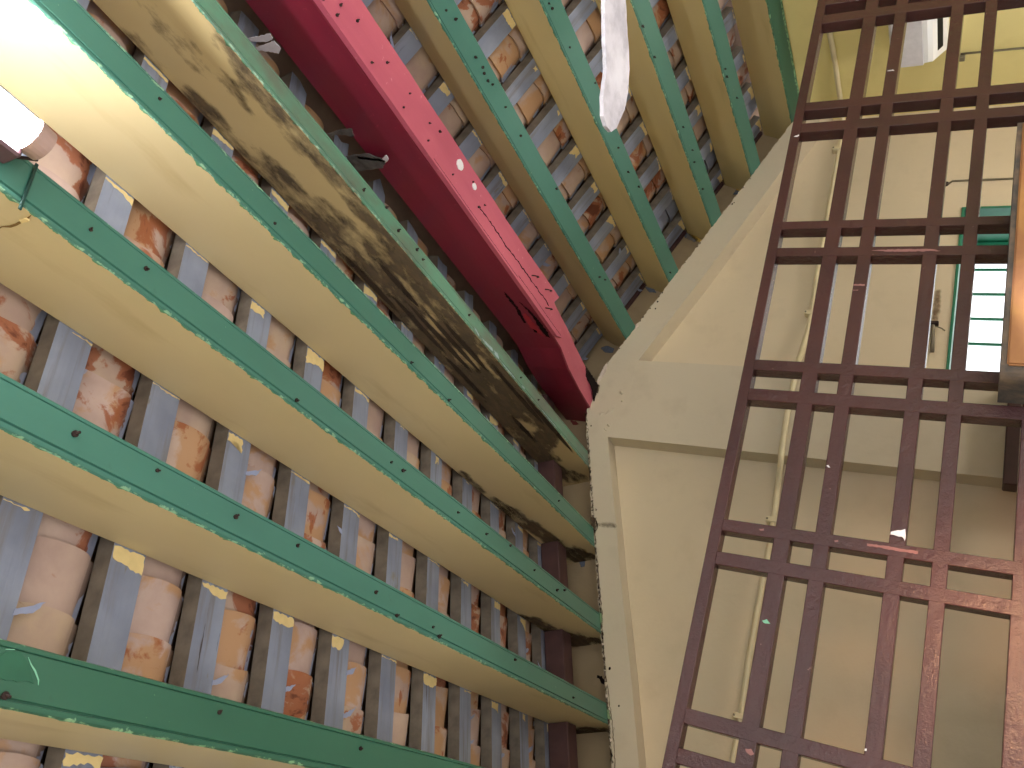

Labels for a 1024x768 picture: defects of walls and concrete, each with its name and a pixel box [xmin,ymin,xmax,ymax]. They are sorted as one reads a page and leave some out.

damp [183,88,227,131]
crack [434,159,559,332]
damp [218,37,612,762]
peeling [867,529,918,554]